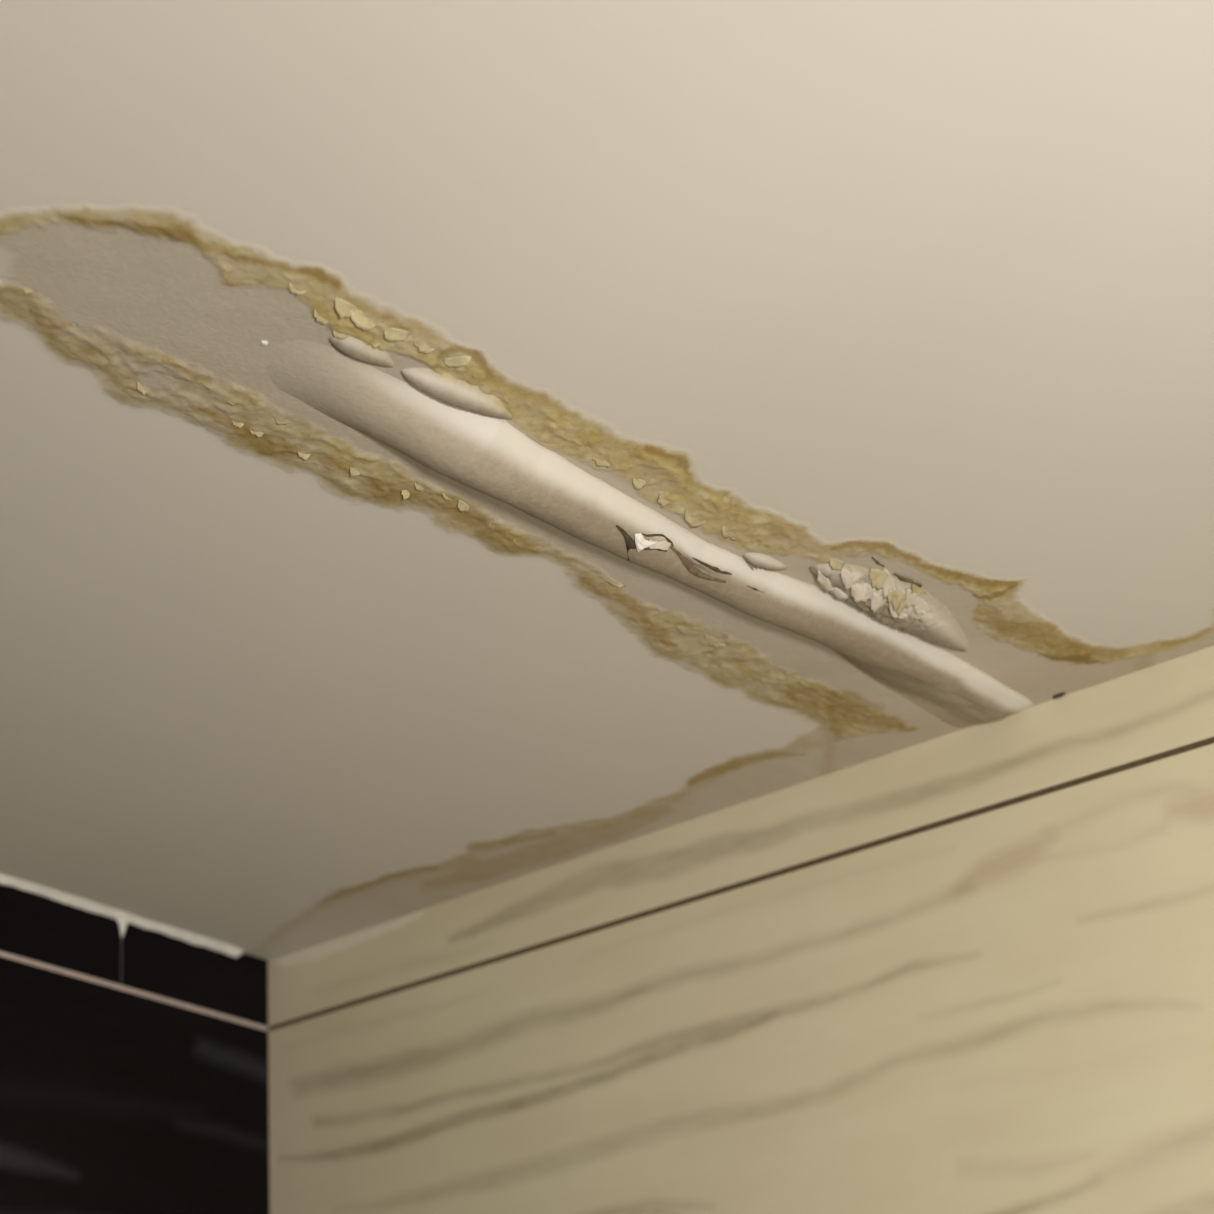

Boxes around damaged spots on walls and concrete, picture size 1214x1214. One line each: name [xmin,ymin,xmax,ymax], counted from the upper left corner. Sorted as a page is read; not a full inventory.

peeling [313,298,471,368]
peeling [401,483,424,500]
damp [0,197,1214,960]
peeling [817,557,931,619]